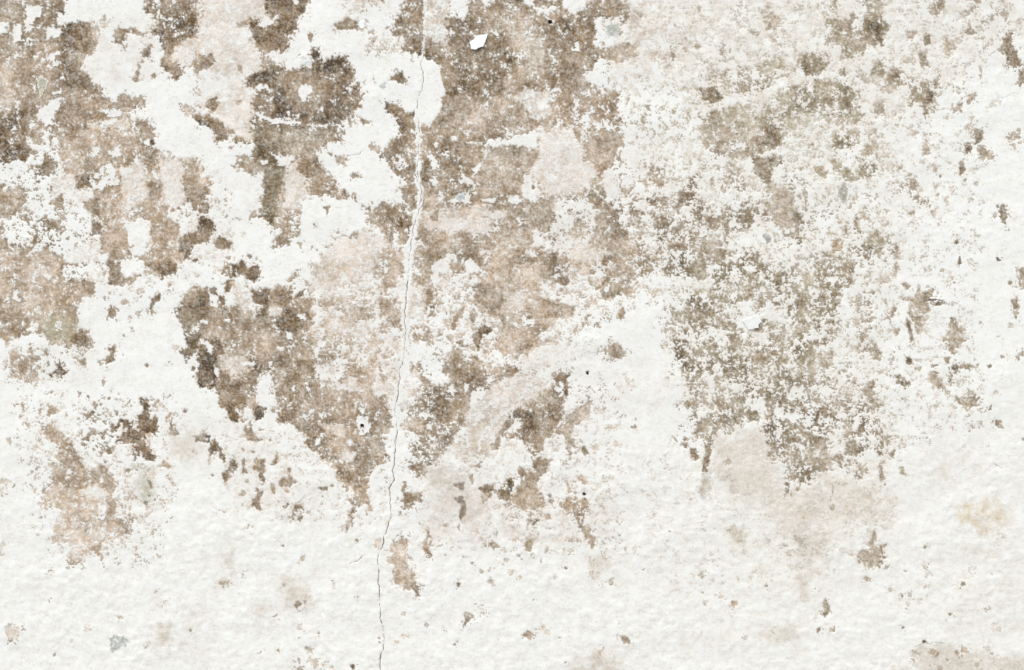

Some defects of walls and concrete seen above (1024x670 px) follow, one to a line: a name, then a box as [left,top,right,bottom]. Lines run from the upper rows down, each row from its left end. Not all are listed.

peeling [379,68,410,89]
peeling [950,90,979,114]
peeling [111,0,373,251]
peeling [902,111,998,187]
peeling [103,292,130,321]
peeling [135,291,164,320]
peeling [614,300,629,322]
peeling [102,344,120,365]
peeling [591,336,632,363]
peeling [20,392,180,570]
crack [350,281,408,670]
peeling [400,481,425,511]